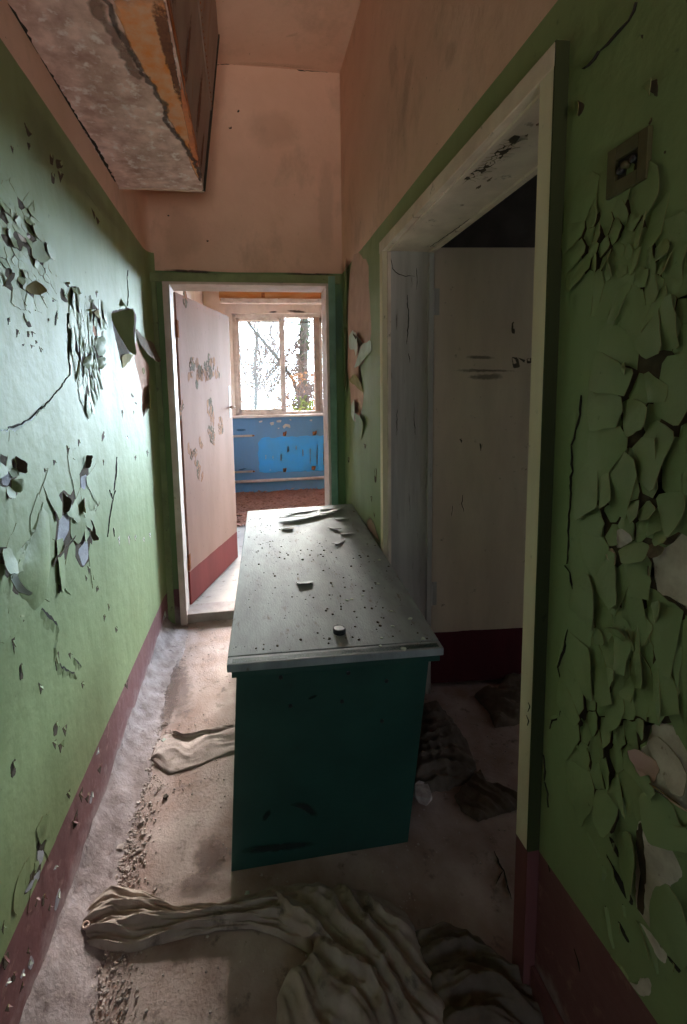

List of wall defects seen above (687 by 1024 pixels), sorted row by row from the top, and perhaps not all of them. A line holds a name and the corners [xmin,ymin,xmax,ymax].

crack [582,2,638,69]
crack [1,313,71,432]
peeling [0,177,161,419]
peeling [344,253,372,448]
peeling [0,427,104,652]
peeling [556,160,687,973]
peeling [52,721,67,753]
peeling [630,978,651,997]